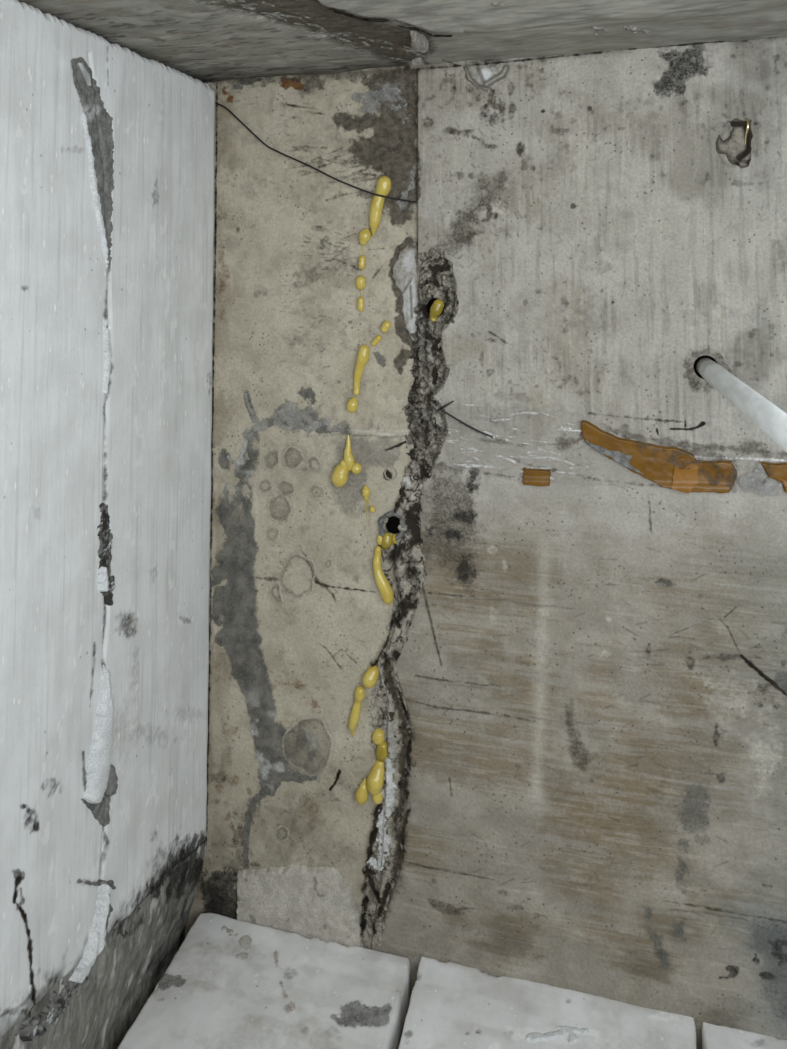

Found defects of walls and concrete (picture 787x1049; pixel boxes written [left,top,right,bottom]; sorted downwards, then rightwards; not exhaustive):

damp [191,0,433,225]
peeling [409,30,429,69]
crack [102,268,112,416]
crack [91,454,116,695]
crack [305,248,521,947]
crack [3,870,36,1017]
spalling [14,977,90,1042]